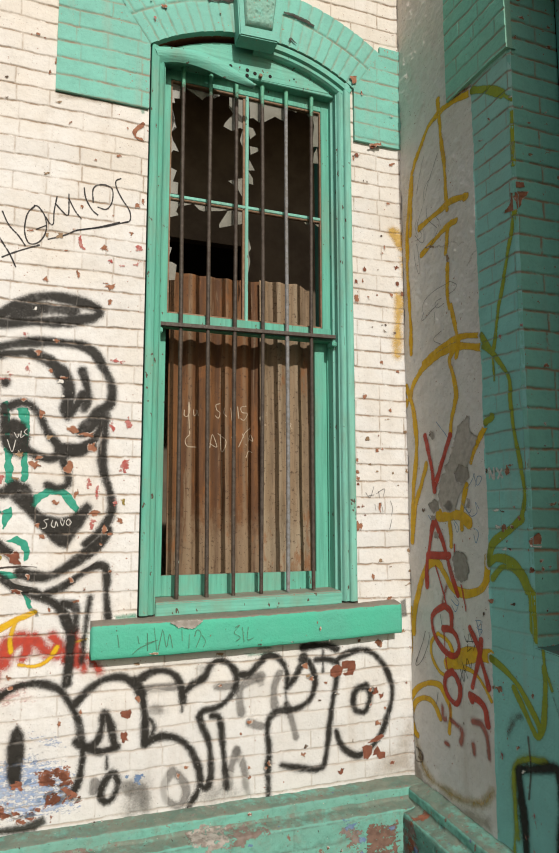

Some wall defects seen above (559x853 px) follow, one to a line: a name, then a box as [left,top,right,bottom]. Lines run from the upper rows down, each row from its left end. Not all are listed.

peeling [127,122,145,141]
spalling [504,181,529,213]
flaking render [422,416,477,521]
spalling [529,533,542,548]
flaking render [452,551,469,584]
spalling [324,660,356,684]
spalling [352,720,396,765]
peeling [185,812,275,853]
spalling [339,810,434,853]